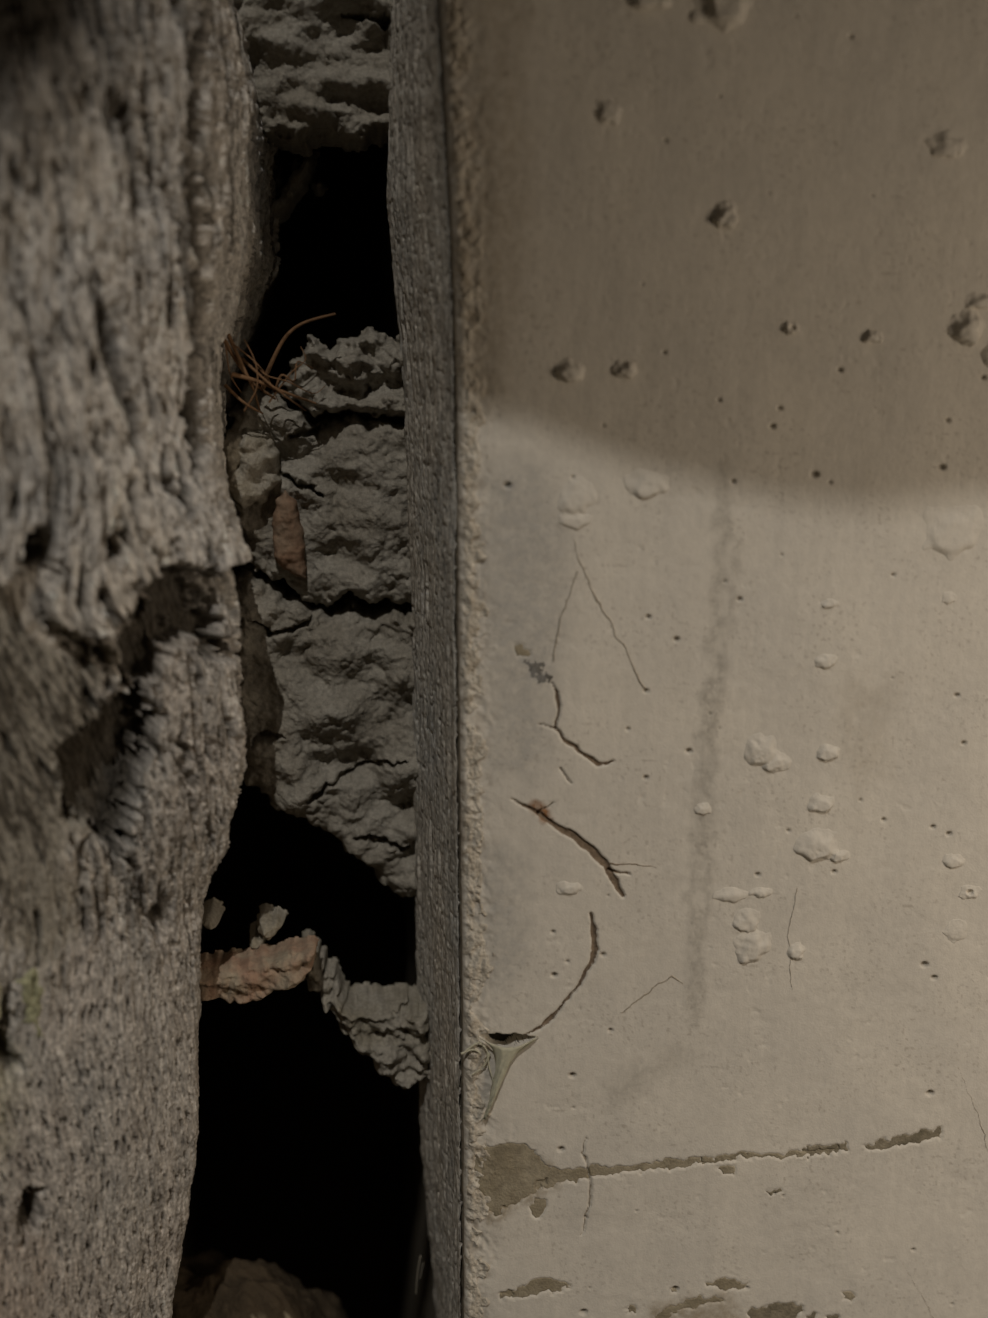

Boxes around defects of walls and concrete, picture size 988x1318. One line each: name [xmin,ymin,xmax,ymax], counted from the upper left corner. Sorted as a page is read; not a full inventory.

crack [514,540,656,897]
spalling [442,0,848,1318]
crack [525,913,598,1035]
peeling [865,1126,941,1150]